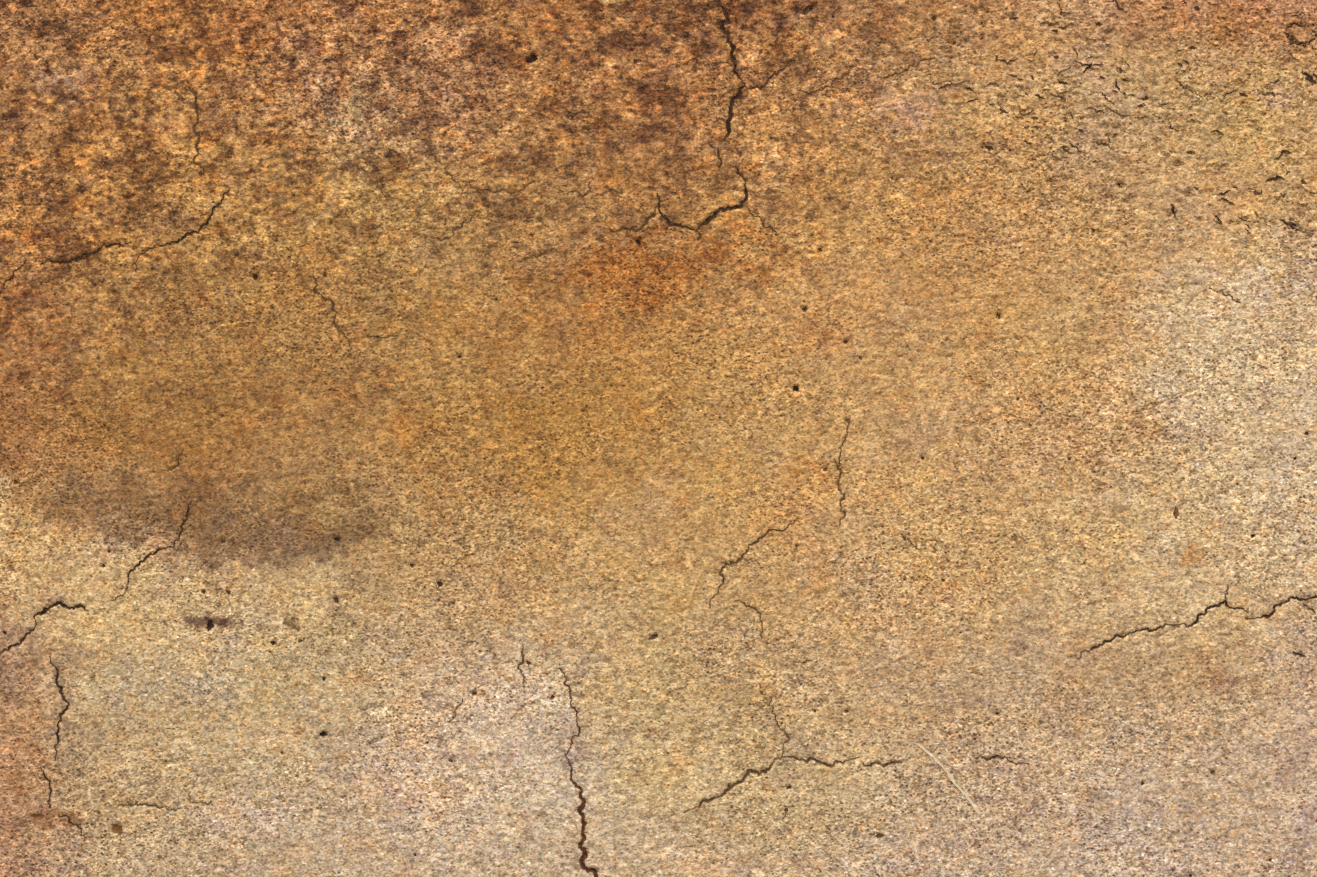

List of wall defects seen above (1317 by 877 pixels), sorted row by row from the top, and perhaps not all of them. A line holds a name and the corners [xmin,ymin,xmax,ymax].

crack [611,0,970,240]
crack [432,173,535,241]
crack [568,181,623,197]
damp [14,457,416,576]
crack [0,500,192,838]
crack [517,644,525,684]
crack [1077,584,1317,659]
crack [559,667,598,877]
crack [684,698,902,813]